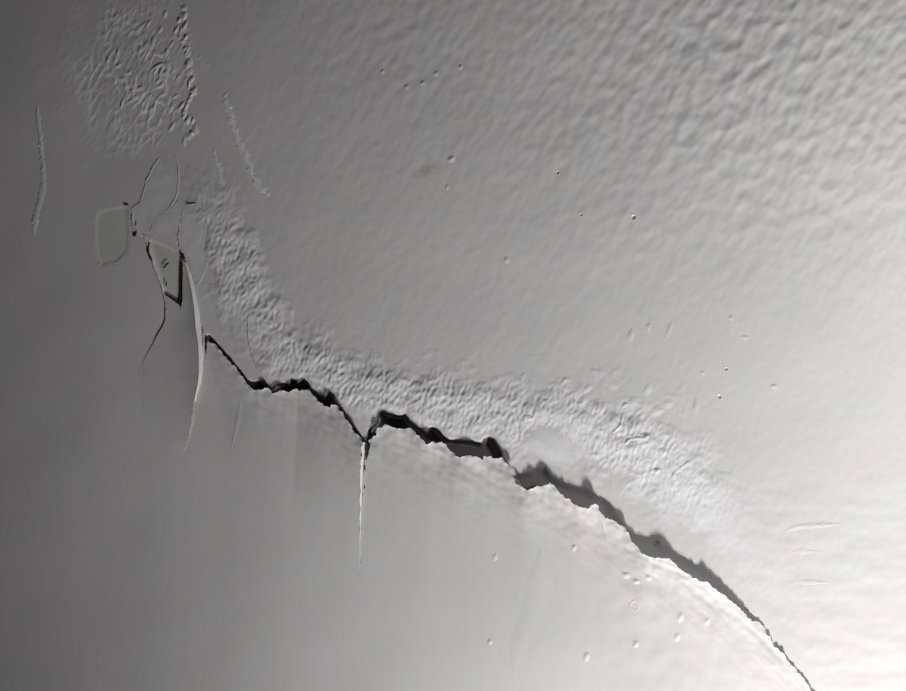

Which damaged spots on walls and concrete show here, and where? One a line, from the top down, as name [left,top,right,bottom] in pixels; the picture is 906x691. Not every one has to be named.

peeling [123,153,811,691]
crack [205,318,813,691]